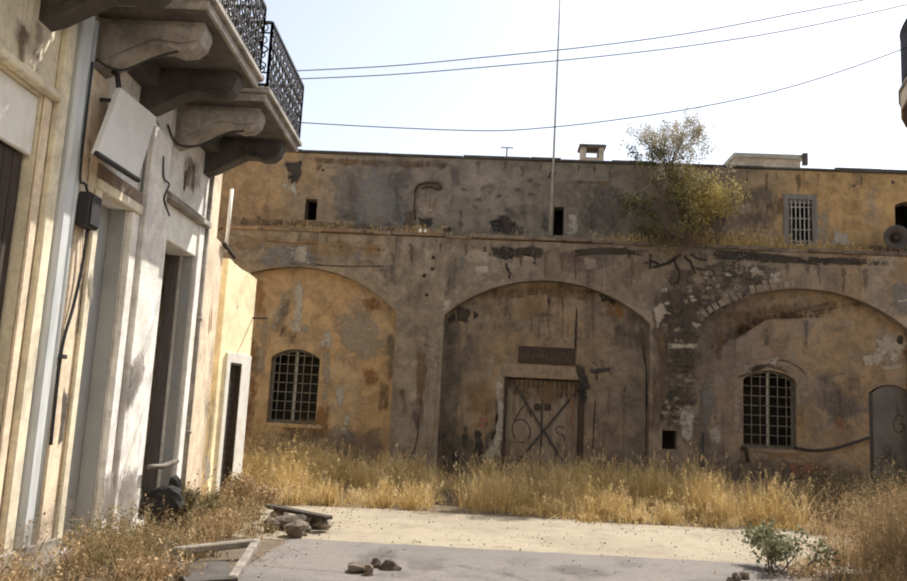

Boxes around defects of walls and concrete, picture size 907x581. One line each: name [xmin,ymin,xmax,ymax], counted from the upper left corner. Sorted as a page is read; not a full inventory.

spalling [282,161,302,196]
spalling [650,259,796,445]
peeling [862,332,907,370]